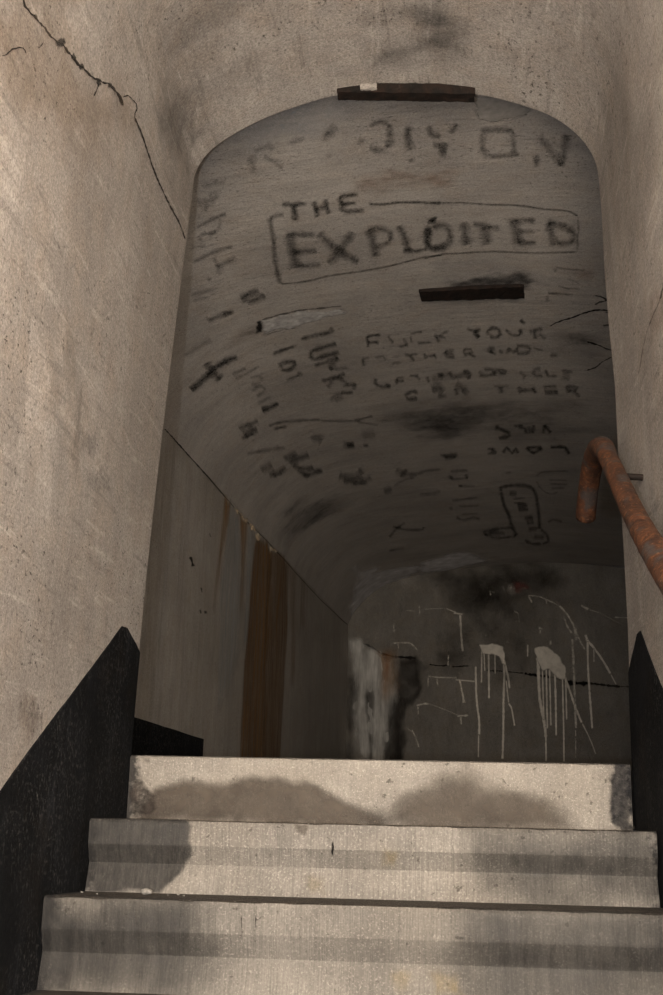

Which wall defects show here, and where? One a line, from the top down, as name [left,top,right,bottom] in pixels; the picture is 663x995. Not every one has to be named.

crack [2,0,185,238]
rust [240,540,287,758]